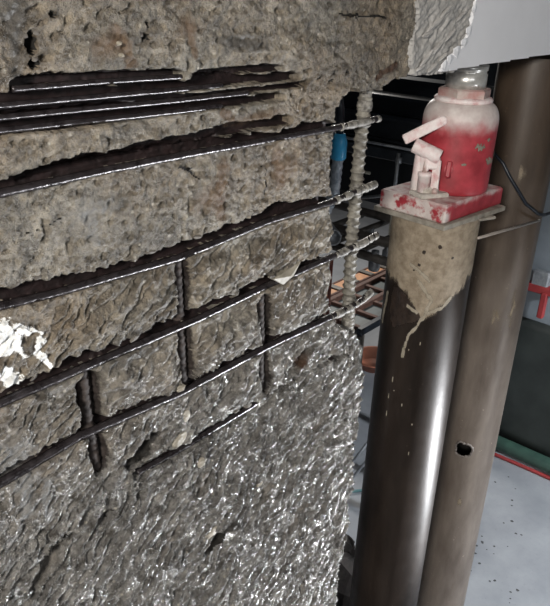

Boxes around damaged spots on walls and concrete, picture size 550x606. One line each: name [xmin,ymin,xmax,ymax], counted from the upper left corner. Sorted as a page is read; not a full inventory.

crack [339,12,386,20]
spalling [0,74,249,134]
spalling [0,89,382,489]
damp [0,317,53,369]
damp [0,366,25,388]